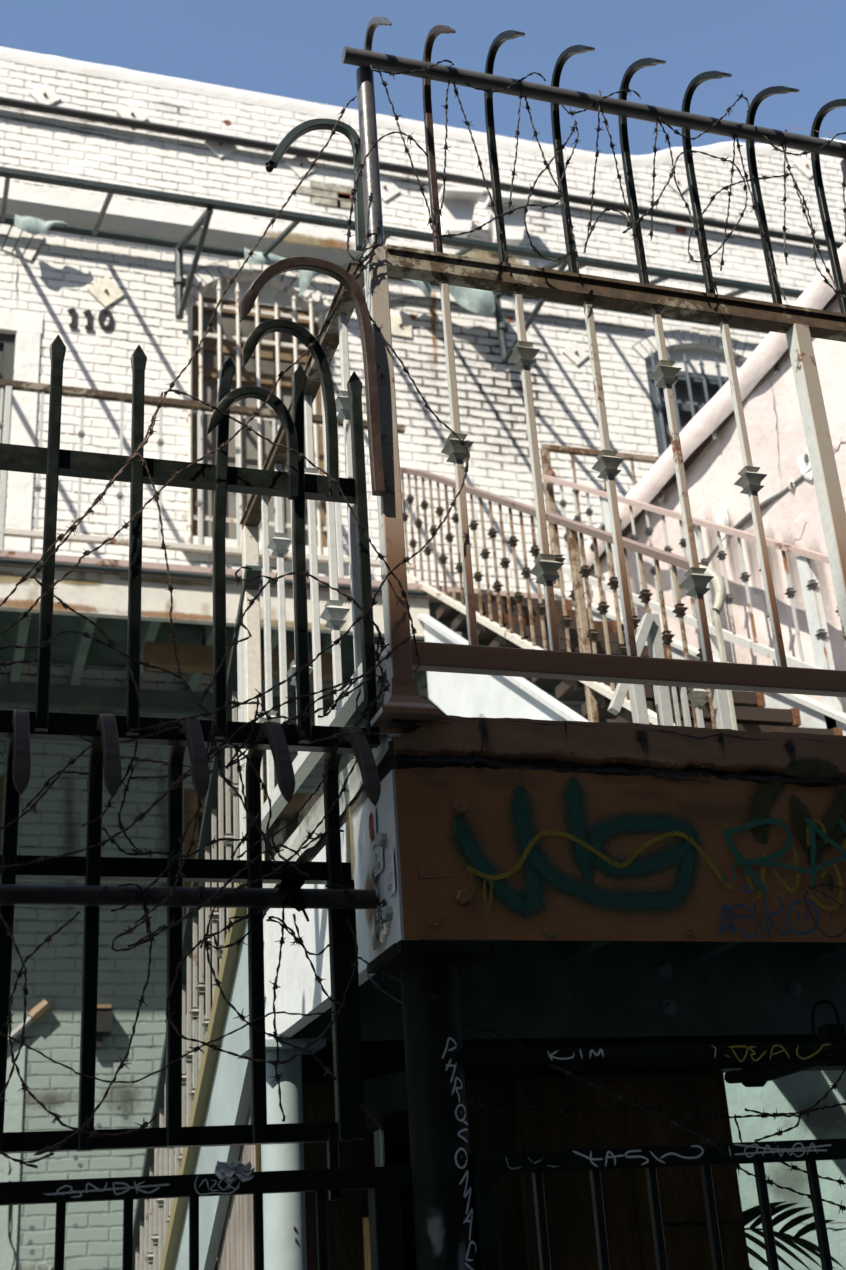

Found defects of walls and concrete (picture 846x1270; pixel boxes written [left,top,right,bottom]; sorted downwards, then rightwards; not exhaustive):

crack [504,719,601,727]
crack [645,729,841,744]